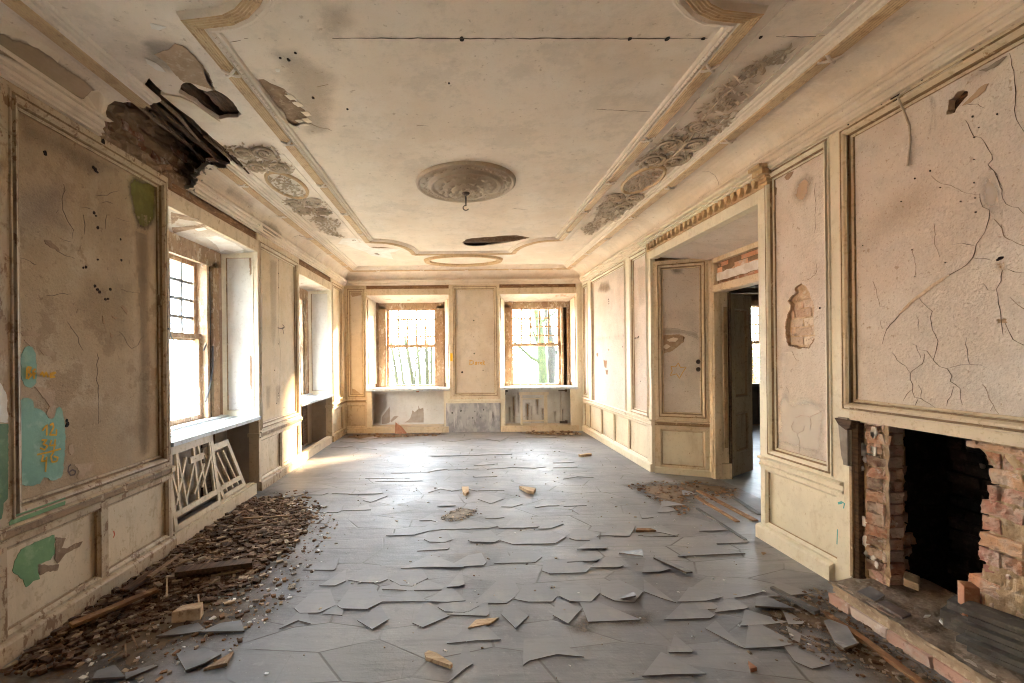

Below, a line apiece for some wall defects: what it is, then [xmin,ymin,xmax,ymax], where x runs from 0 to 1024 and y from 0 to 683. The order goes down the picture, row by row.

peeling [145,44,215,91]
flaking render [259,69,312,131]
spalling [946,56,1007,114]
crack [1009,53,1024,131]
spalling [81,90,191,199]
flaking render [463,235,529,243]
crack [873,104,1024,414]
spalling [785,283,815,349]
peeling [38,537,83,575]